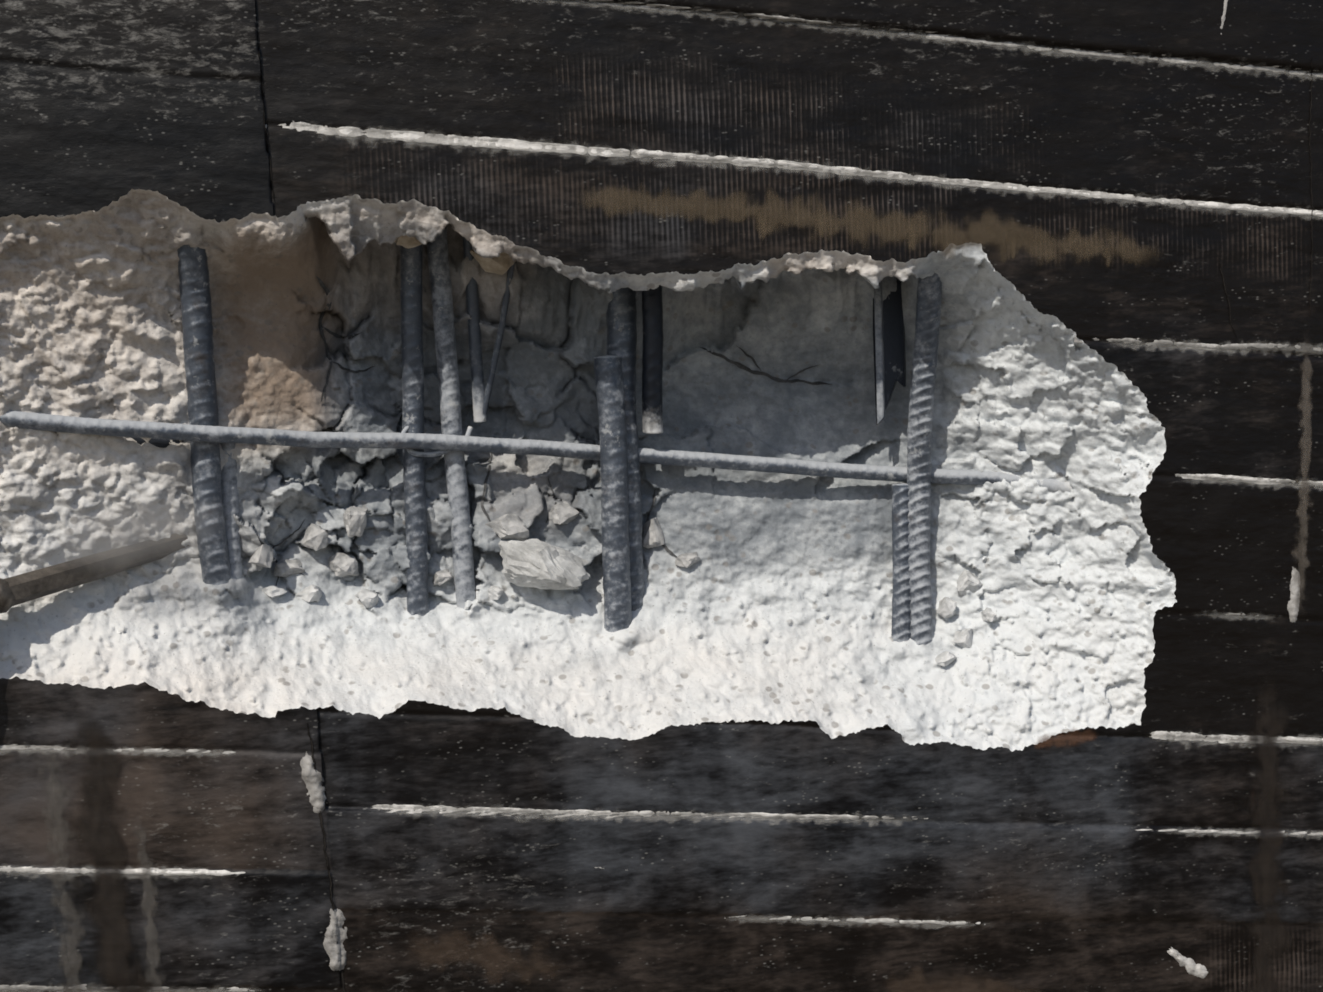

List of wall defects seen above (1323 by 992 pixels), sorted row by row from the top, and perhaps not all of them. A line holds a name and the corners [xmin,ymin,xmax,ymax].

crack [258,44,275,202]
spalling [0,189,1177,752]
damp [0,725,245,992]